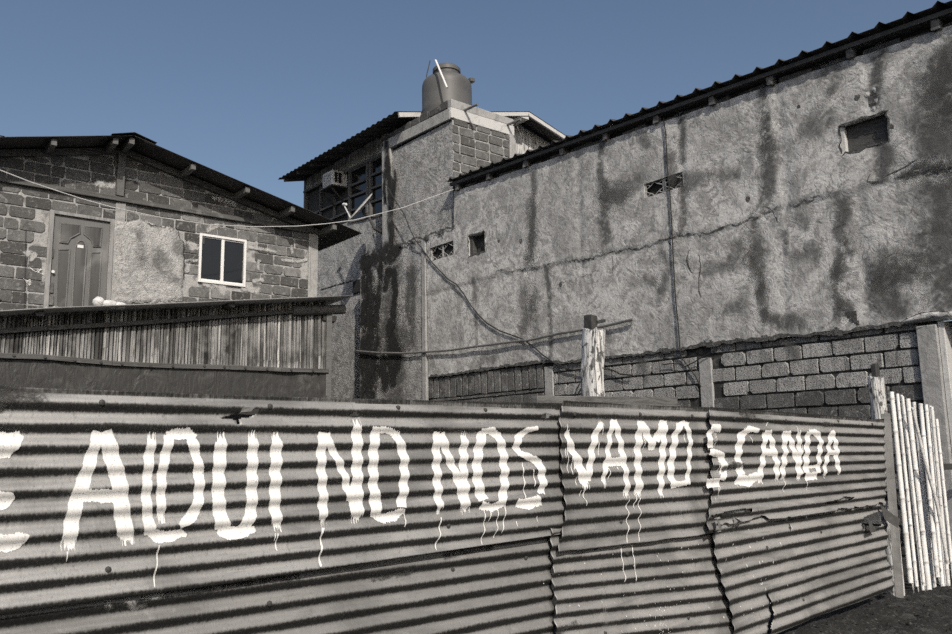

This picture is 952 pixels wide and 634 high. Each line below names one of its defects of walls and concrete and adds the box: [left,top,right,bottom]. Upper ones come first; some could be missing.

damp [356,137,416,400]
damp [597,140,610,245]
crack [490,206,778,285]
damp [760,87,776,208]
damp [750,219,802,329]
damp [831,197,855,321]
damp [870,39,952,317]
crack [896,167,951,178]